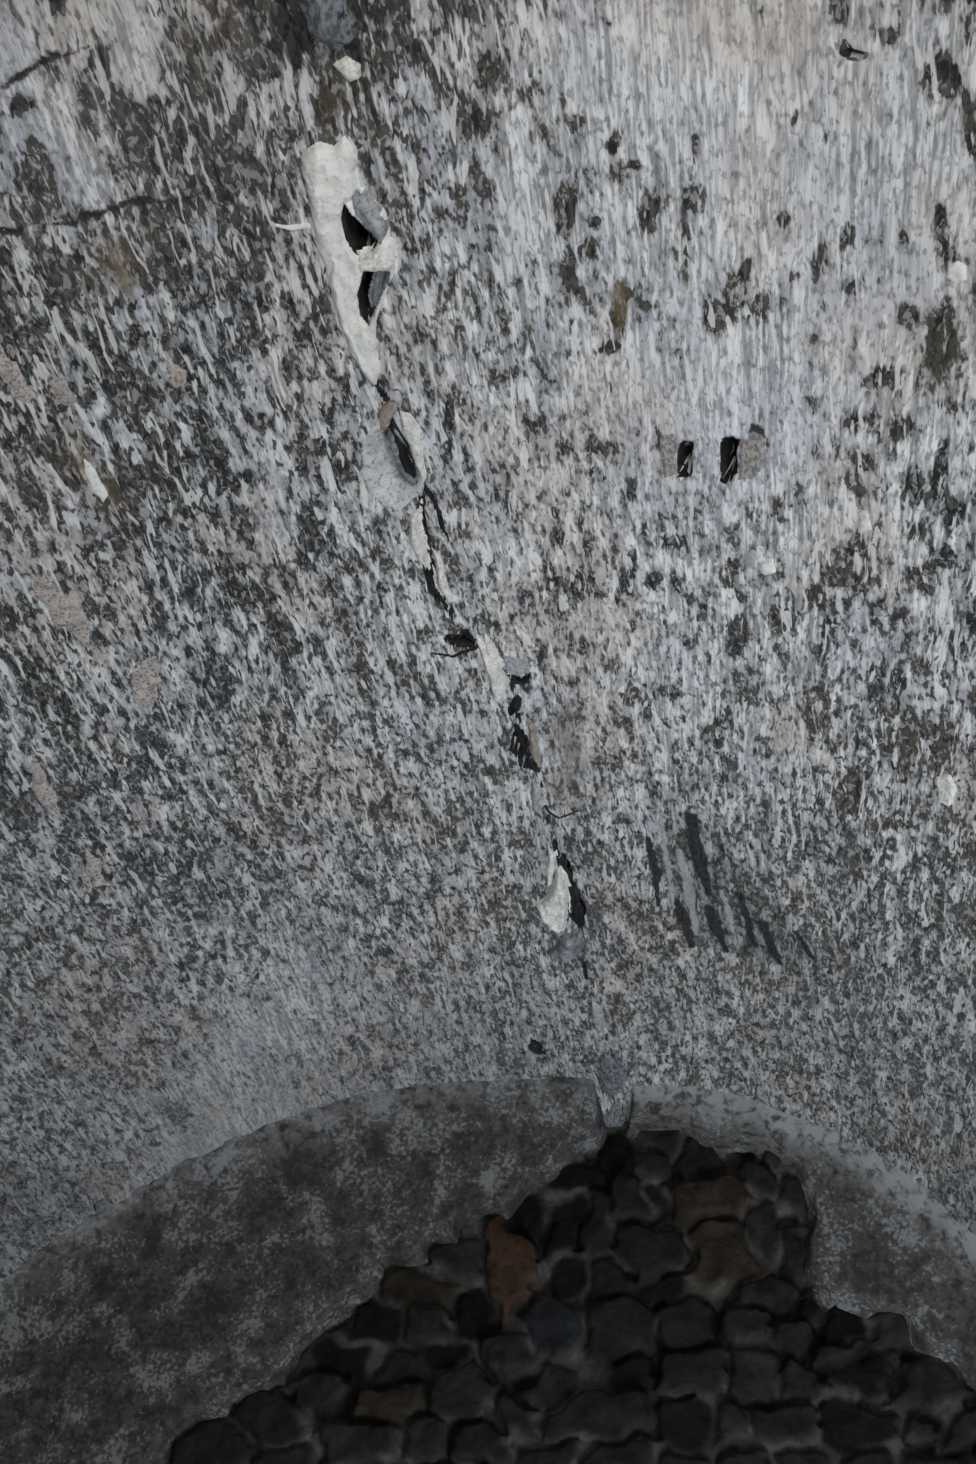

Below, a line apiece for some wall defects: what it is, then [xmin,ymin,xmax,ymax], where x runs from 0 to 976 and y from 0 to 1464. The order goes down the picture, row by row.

flaking render [272,135,397,385]
spalling [738,424,770,480]
crack [374,380,605,1034]